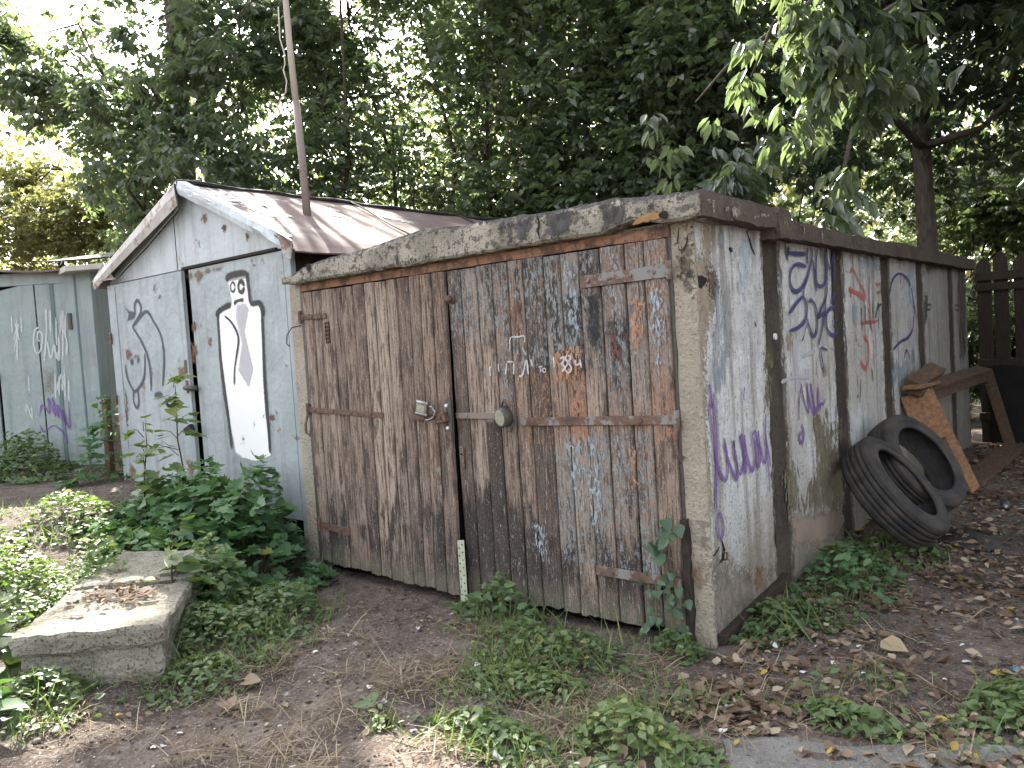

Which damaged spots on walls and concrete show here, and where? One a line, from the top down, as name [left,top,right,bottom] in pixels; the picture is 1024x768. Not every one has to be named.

leakage [496,210,574,246]
leakage [602,204,625,228]
spalling [633,210,668,225]
peeling [551,261,668,384]
leakage [788,507,844,548]